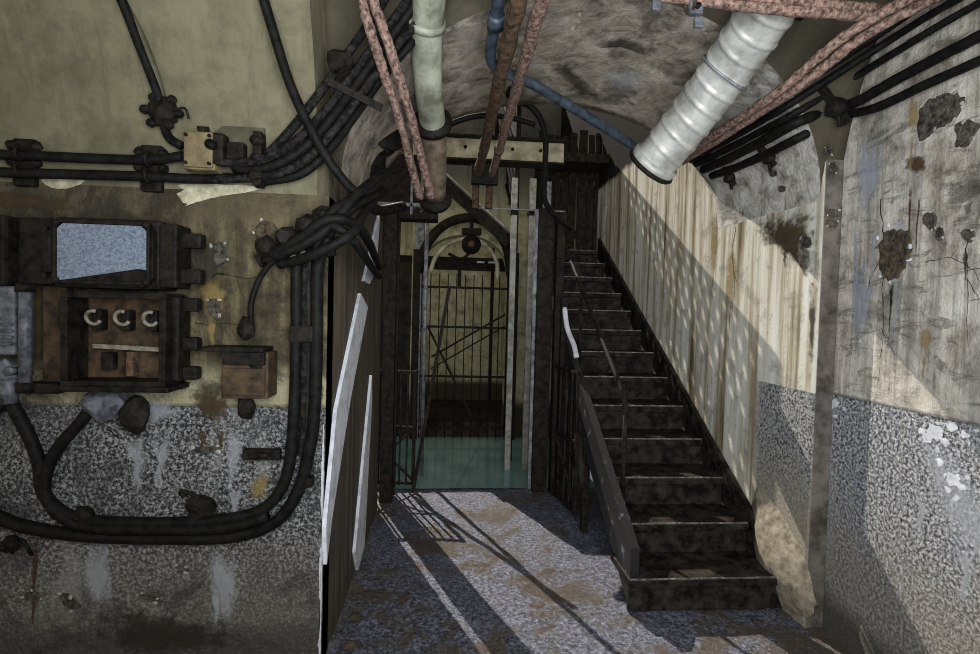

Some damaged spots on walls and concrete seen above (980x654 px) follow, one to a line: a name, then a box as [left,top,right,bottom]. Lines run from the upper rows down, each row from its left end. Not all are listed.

spalling [917,90,980,151]
spalling [876,223,913,326]
spalling [921,210,945,241]
spalling [958,228,976,279]